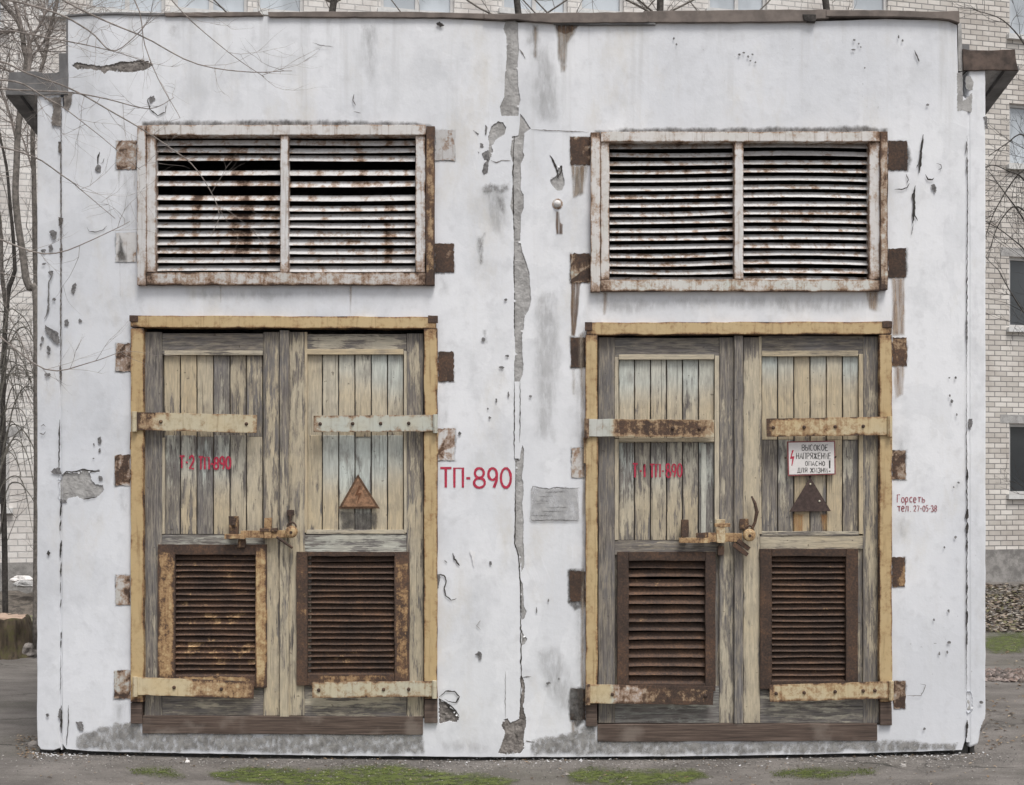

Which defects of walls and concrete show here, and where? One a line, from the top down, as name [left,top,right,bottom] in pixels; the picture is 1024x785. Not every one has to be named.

flaking render [73,60,152,74]
peeling [473,121,510,174]
crack [512,129,582,230]
crack [898,136,924,235]
crack [510,257,518,336]
flaking render [51,437,104,503]
flaking render [439,699,460,723]
flaking render [498,676,526,755]